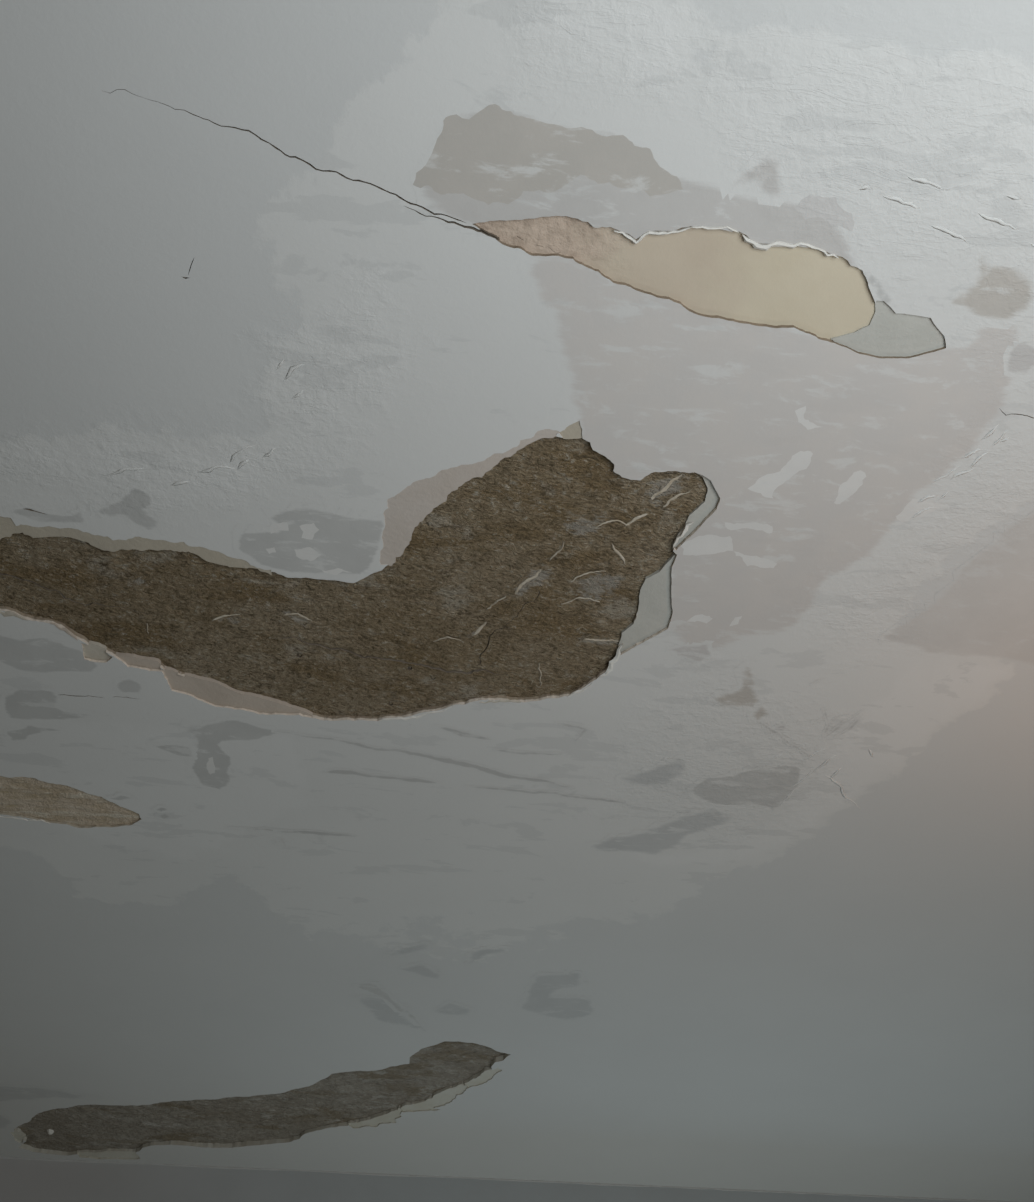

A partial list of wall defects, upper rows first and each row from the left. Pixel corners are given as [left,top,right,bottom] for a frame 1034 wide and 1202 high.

crack [104,89,500,240]
flaking render [0,96,1034,795]
flaking render [0,776,141,828]
flaking render [10,1041,511,1160]